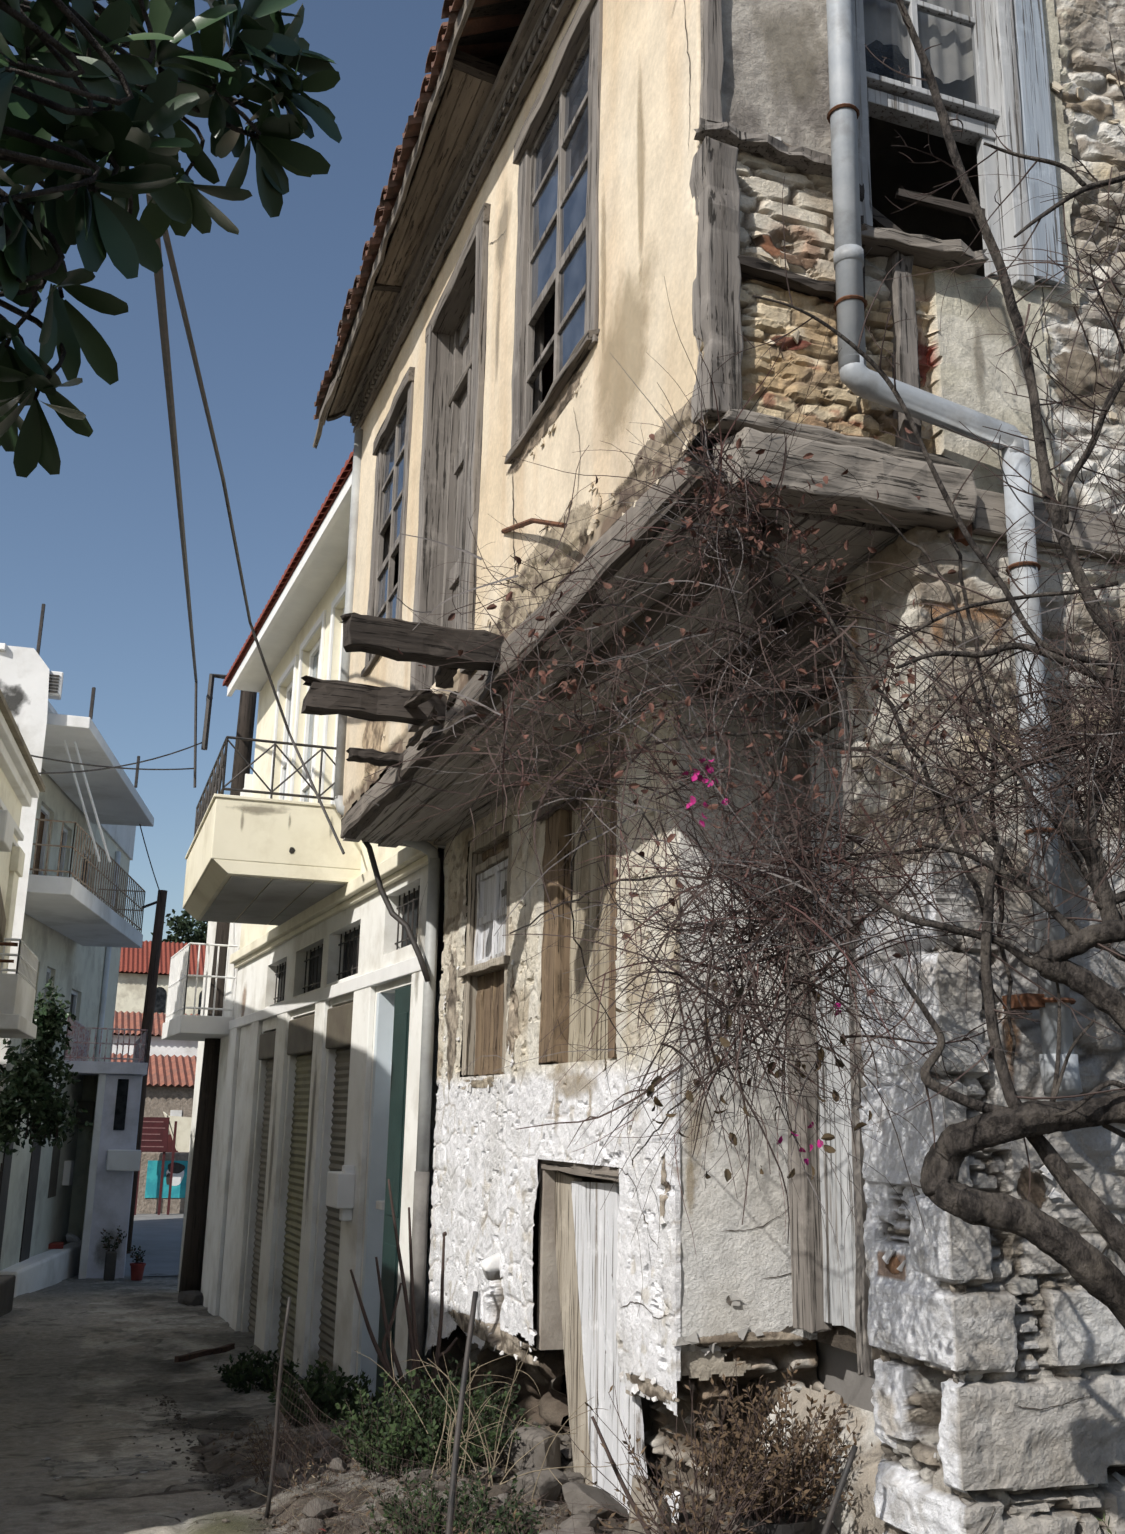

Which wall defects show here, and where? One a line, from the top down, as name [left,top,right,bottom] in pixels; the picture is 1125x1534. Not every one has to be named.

spalling [750,231,817,271]
flaking render [763,329,811,350]
flaking render [916,308,940,387]
flaking render [486,398,694,634]
peeling [629,1371,676,1402]